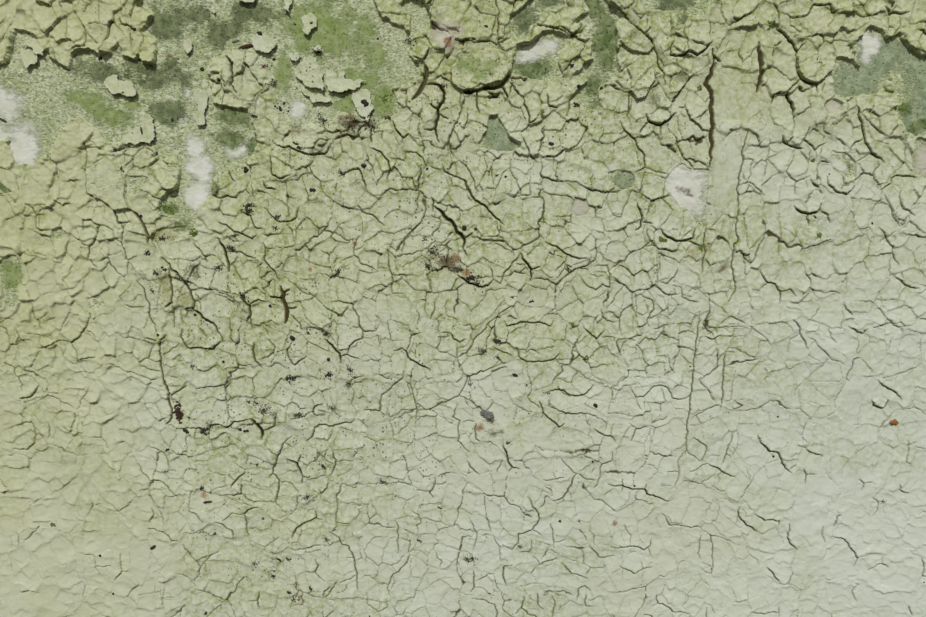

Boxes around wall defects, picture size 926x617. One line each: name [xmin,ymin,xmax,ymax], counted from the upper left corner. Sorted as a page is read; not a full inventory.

leakage [72,51,204,127]
peeling [0,0,431,235]
leakage [148,2,288,50]
leakage [274,99,393,136]
crack [435,84,503,135]
peeling [451,0,567,89]
peeling [574,0,655,113]
crack [657,53,718,154]
peeling [798,29,926,179]
leakage [183,134,214,211]
crack [435,207,465,246]
crack [281,287,289,322]